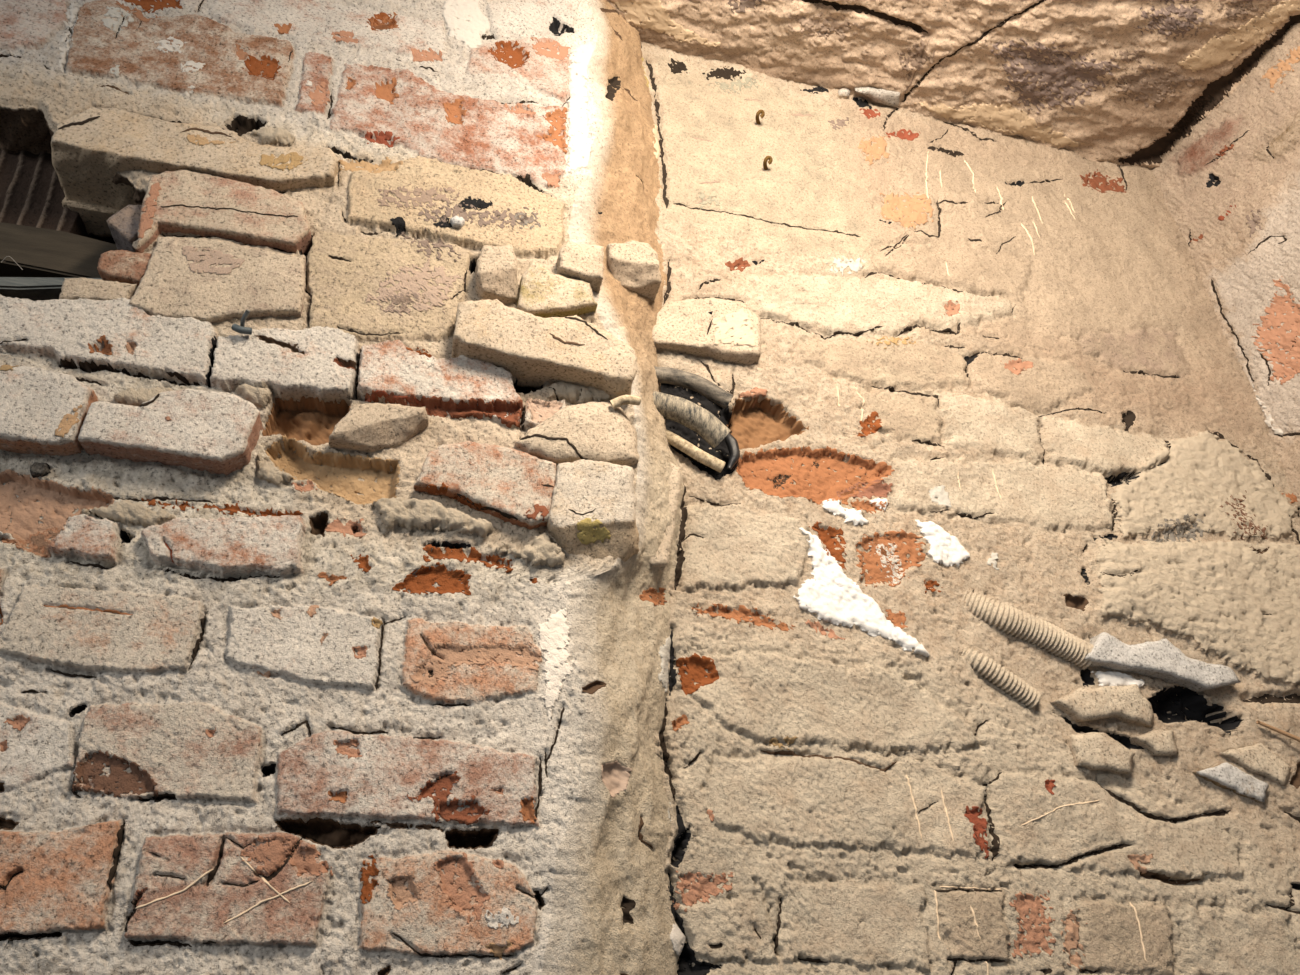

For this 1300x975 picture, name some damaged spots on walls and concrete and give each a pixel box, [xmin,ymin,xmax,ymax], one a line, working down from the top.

flaking render [442,0,594,188]
crack [802,0,1046,131]
spalling [129,170,312,324]
spalling [364,260,637,430]
spalling [652,298,762,365]
crack [1211,279,1297,386]
flaking render [392,544,513,595]
crack [674,484,741,590]
flaking render [733,445,943,594]
crack [638,630,700,975]
crack [935,772,1200,893]
crack [1100,785,1231,824]